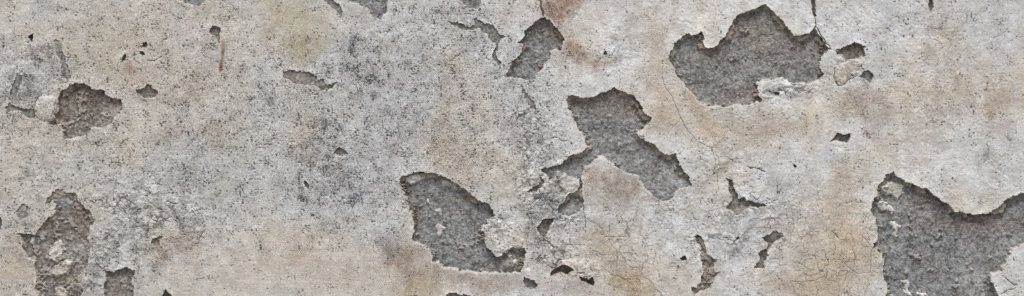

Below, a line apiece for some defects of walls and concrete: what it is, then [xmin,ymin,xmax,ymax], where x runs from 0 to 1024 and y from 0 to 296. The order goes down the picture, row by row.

spalling [47,39,123,140]
flaking render [283,69,338,92]
spalling [448,0,564,110]
spalling [668,0,866,108]
spalling [13,188,94,296]
spalling [103,267,135,296]
spalling [399,172,538,291]
spalling [527,87,692,238]
spalling [691,234,720,295]
spalling [726,178,766,216]
spalling [754,231,784,270]
spalling [870,171,1024,296]